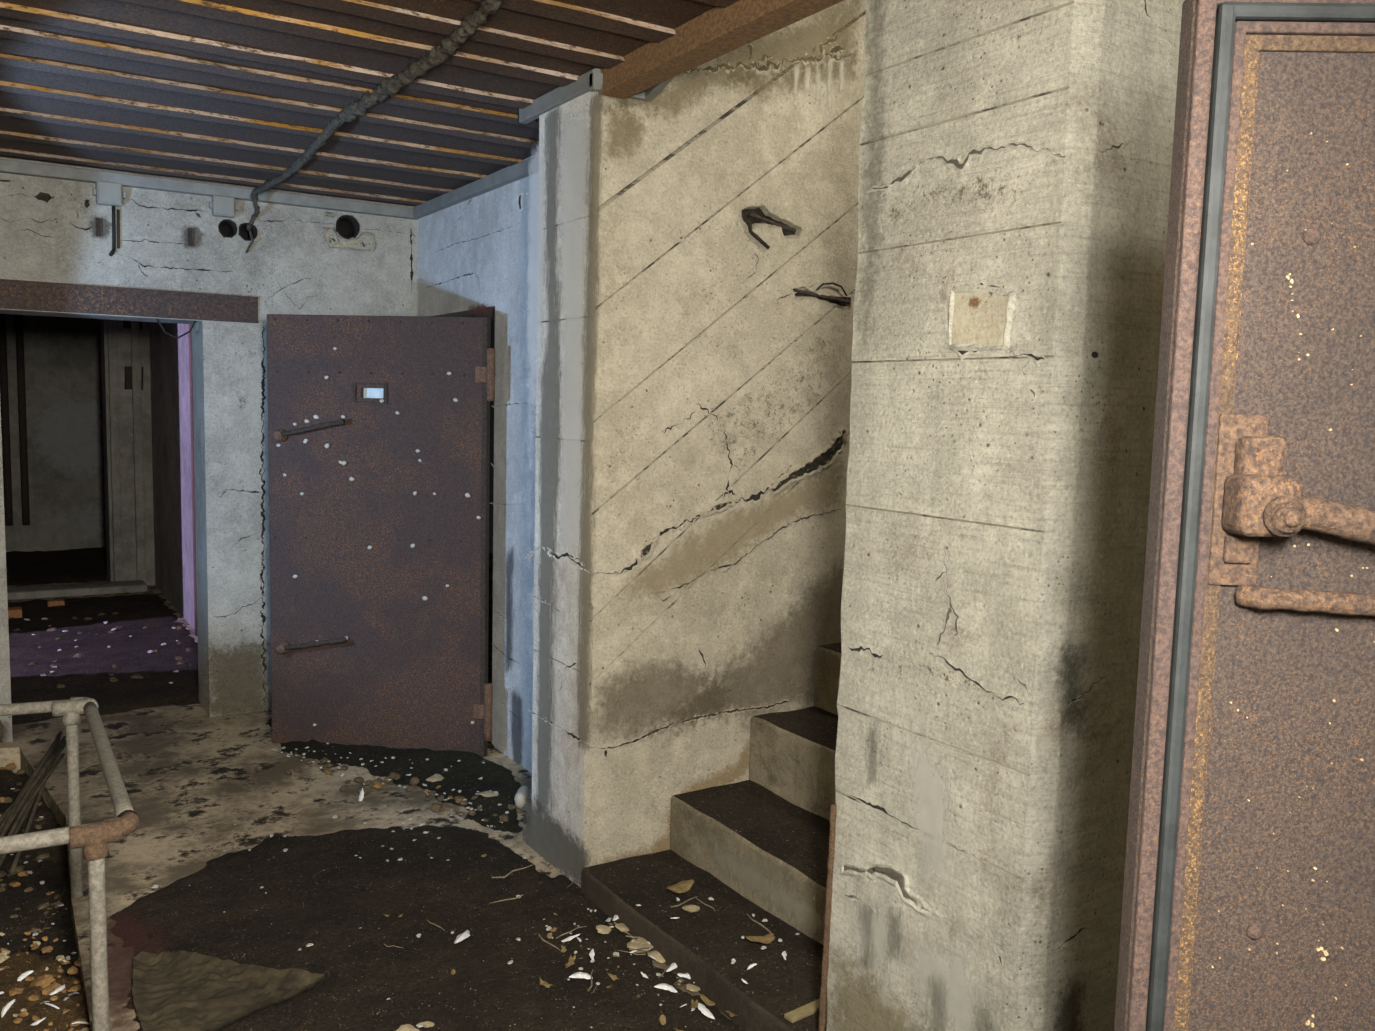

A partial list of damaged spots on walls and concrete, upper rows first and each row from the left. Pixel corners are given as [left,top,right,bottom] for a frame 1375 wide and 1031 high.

damp [577,7,854,745]
damp [512,110,587,887]
crack [500,660,809,758]
crack [490,403,843,664]
crack [698,647,707,669]
crack [848,642,884,662]
crack [929,528,1029,707]